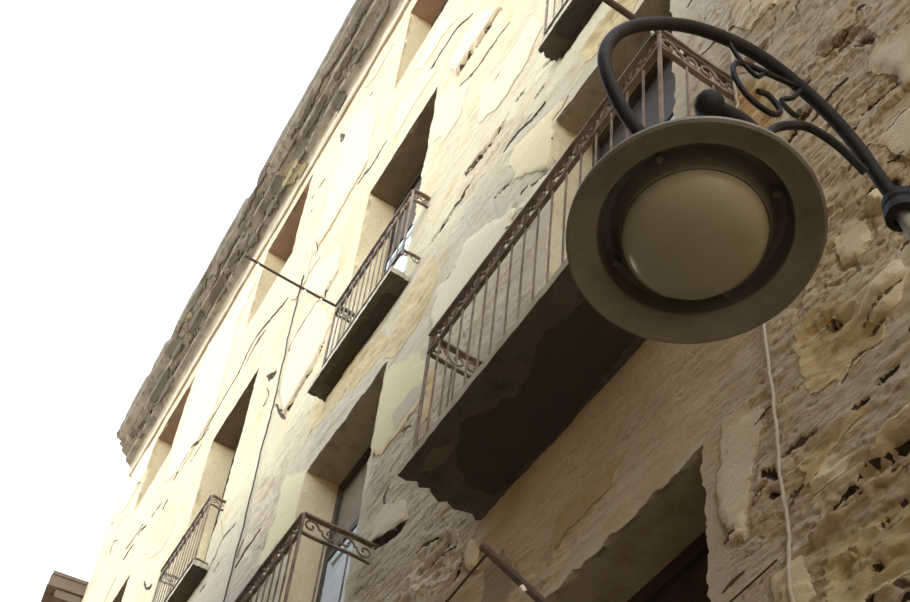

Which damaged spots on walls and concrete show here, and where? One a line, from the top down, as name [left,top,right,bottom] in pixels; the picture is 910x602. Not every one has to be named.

spalling [307,253,439,438]